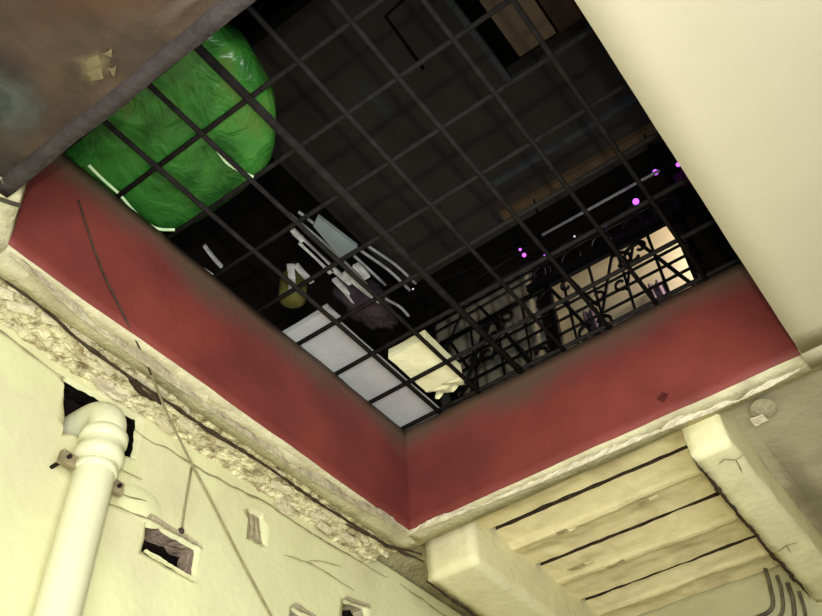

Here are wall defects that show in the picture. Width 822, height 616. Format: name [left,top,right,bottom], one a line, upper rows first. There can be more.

spalling [0,252,801,563]
spalling [141,514,203,583]
spalling [290,603,316,616]
spalling [342,596,371,616]